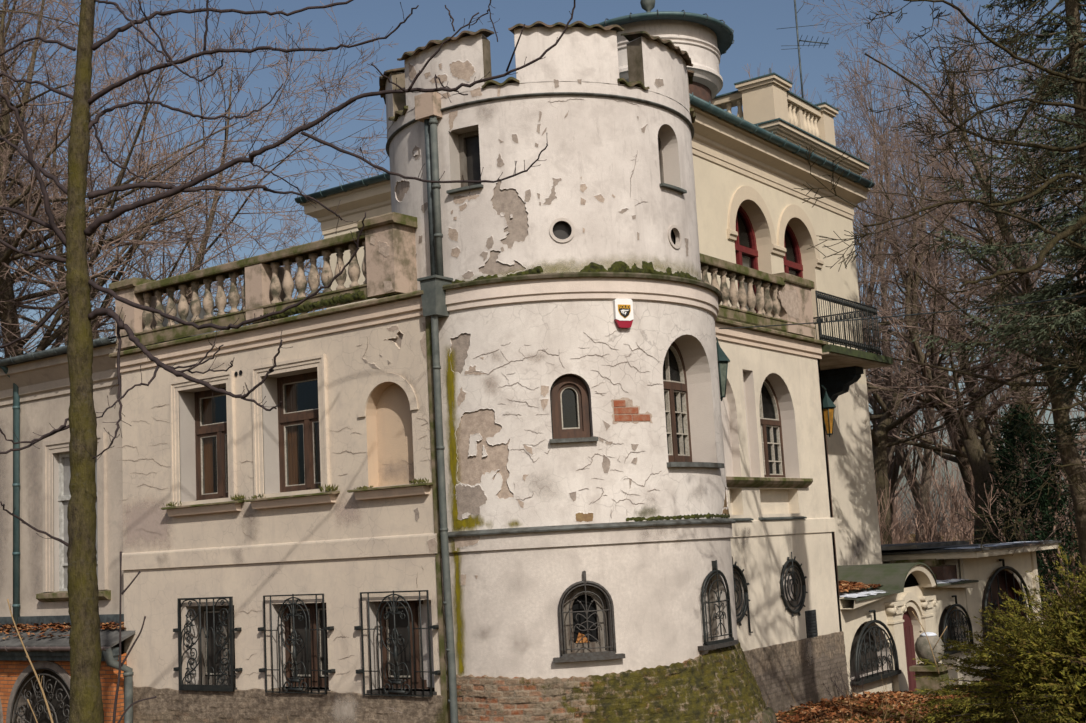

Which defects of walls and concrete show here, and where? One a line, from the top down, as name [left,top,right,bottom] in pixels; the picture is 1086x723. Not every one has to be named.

peeling [408,59,483,132]
peeling [534,110,548,148]
peeling [394,179,410,203]
peeling [447,133,562,280]
peeling [383,325,404,350]
peeling [449,332,533,520]
crack [469,331,662,461]
flaking render [598,397,653,474]
crack [572,436,661,518]